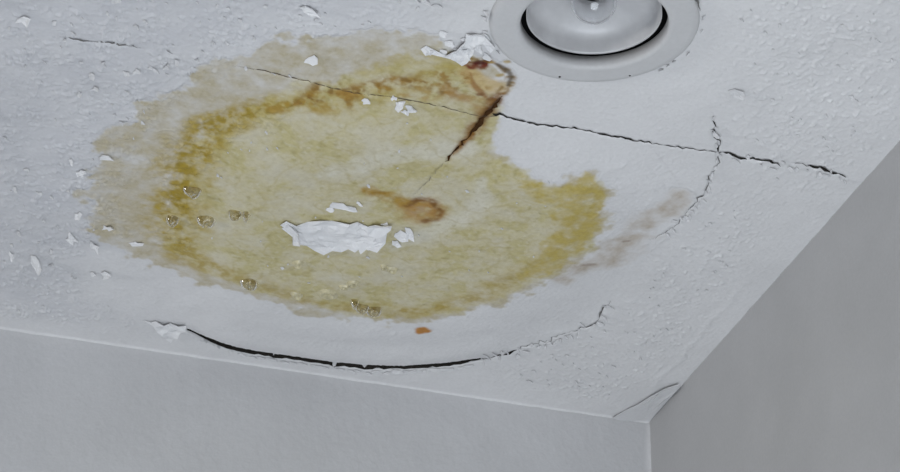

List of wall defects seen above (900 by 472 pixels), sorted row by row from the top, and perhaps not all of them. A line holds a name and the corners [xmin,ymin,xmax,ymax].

peeling [421,10,500,66]
peeling [280,201,420,259]
water stain [70,25,700,335]
corrosion [361,185,449,224]
crack [244,66,847,239]
peeling [143,320,186,343]
crack [187,301,615,376]